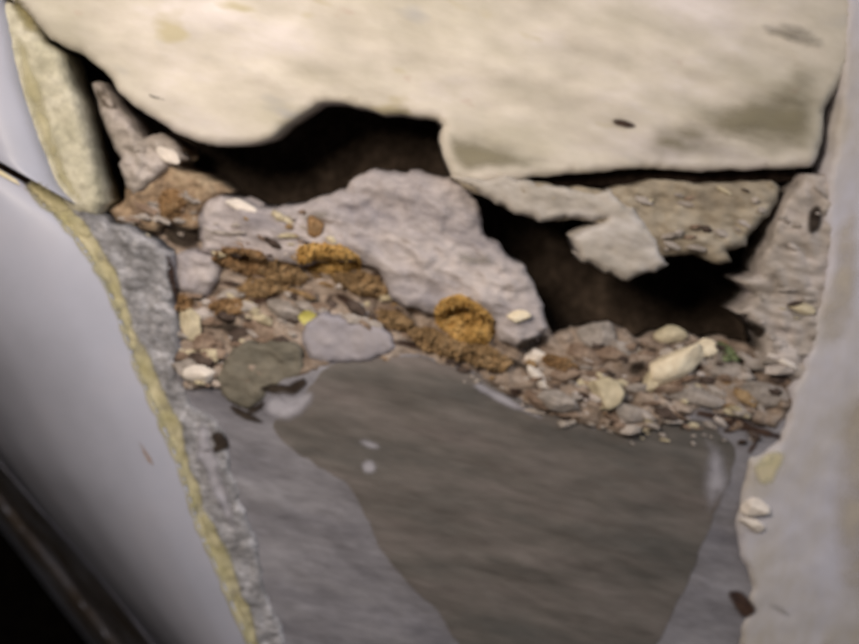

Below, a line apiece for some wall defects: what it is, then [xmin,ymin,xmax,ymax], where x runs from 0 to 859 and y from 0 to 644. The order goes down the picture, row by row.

crack [0,162,32,183]
flaking render [65,47,832,381]
spalling [205,432,229,452]